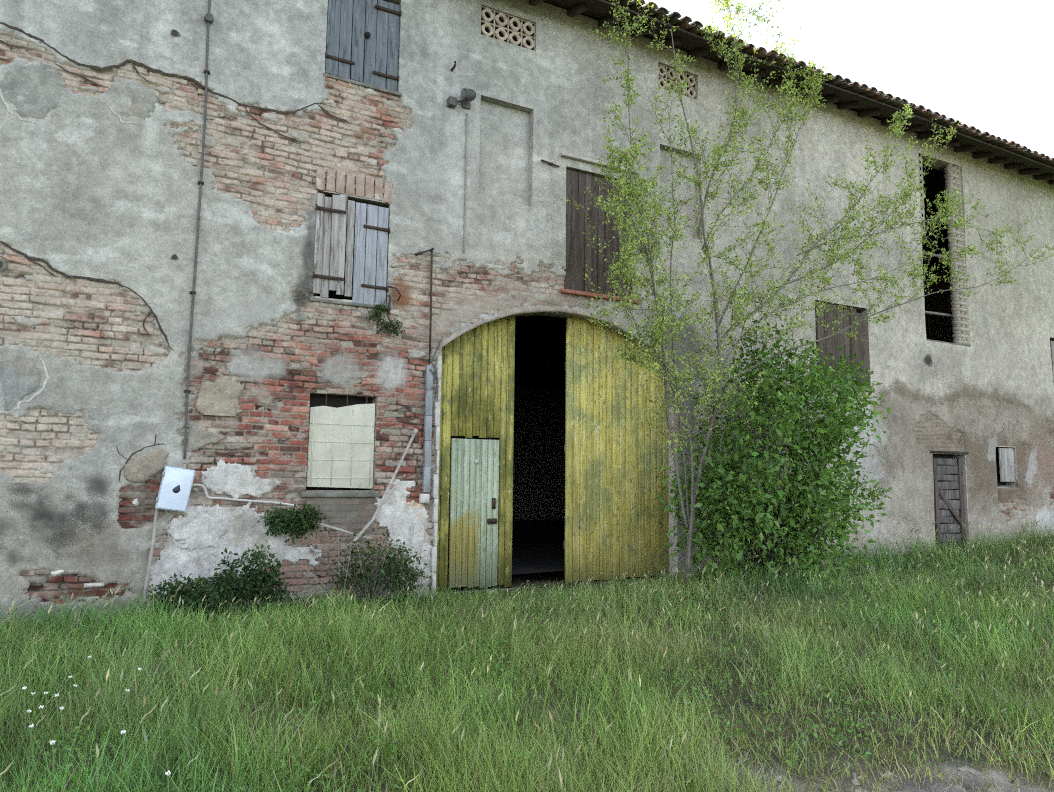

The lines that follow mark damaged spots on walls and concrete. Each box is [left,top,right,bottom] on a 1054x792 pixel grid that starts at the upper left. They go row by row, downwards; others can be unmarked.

flaking render [0,29,412,232]
flaking render [0,244,599,604]
leakage [849,406,900,482]
leakage [950,387,1054,500]
leakage [1035,507,1054,533]